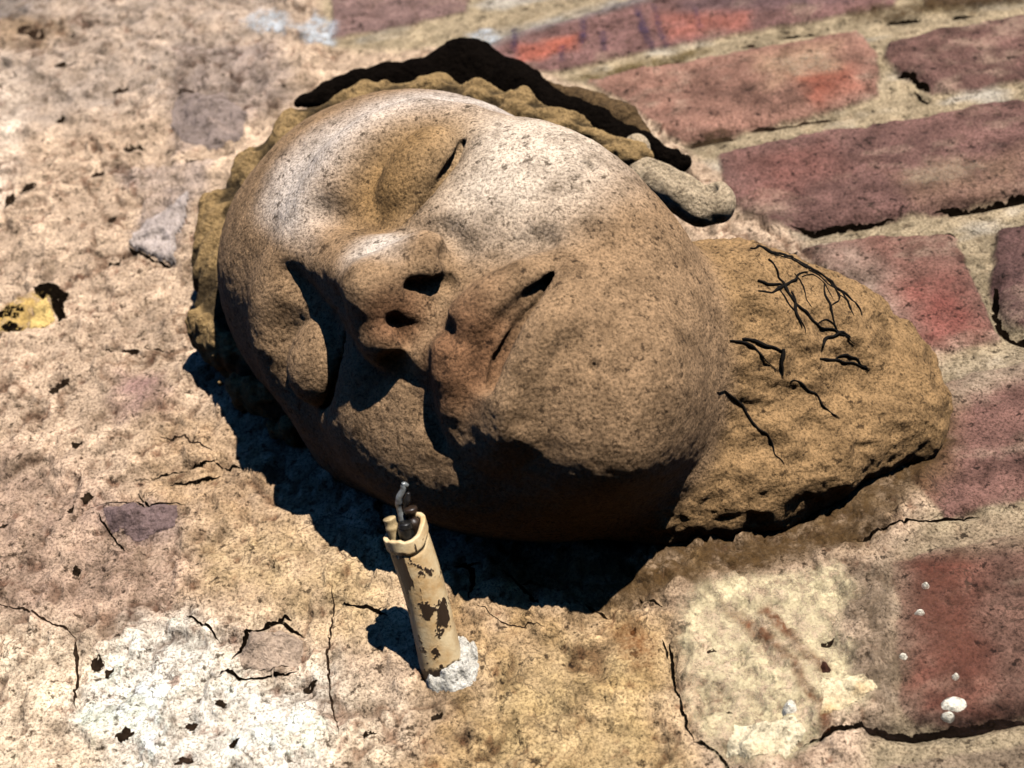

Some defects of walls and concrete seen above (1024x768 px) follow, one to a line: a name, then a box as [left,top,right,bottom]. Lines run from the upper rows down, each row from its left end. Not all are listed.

peeling [29,298,55,328]
crack [90,434,242,551]
crack [0,604,80,709]
crack [187,586,388,734]
crack [662,640,729,768]